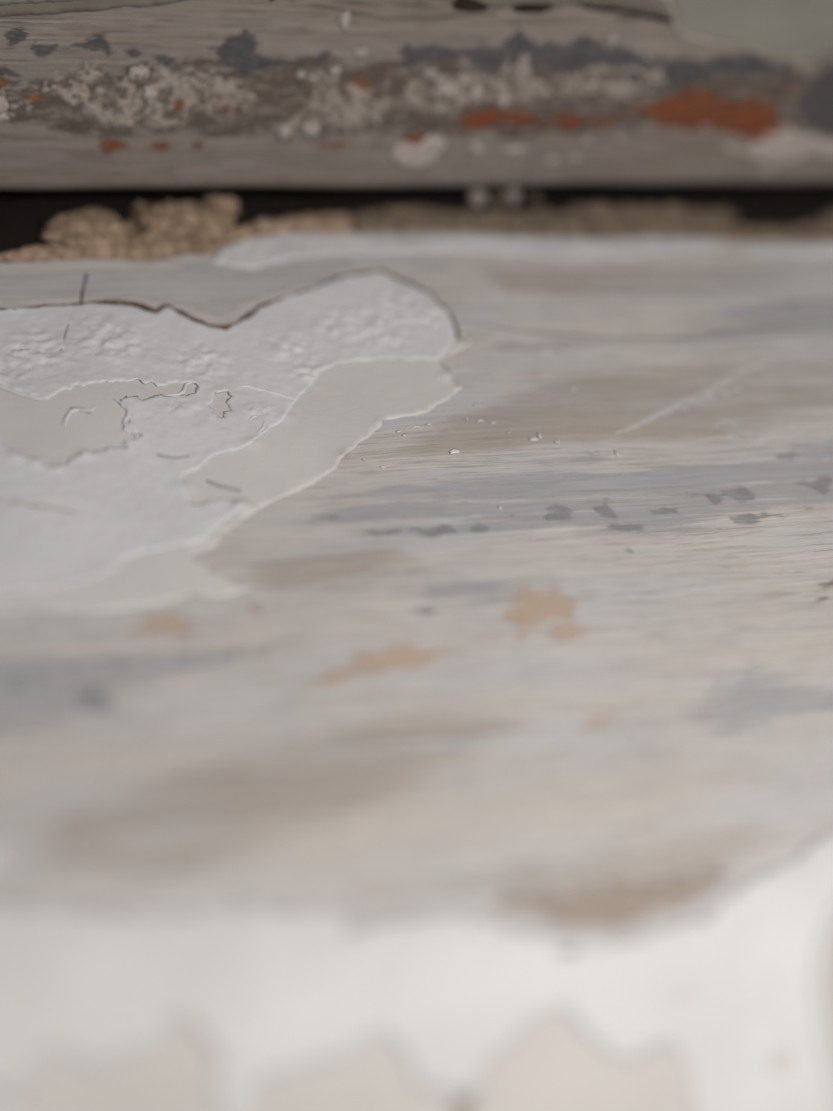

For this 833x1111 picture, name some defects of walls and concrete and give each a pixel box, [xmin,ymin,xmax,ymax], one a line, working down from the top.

peeling [0,0,186,17]
peeling [478,0,833,63]
spalling [0,194,833,263]
peeling [0,269,474,613]